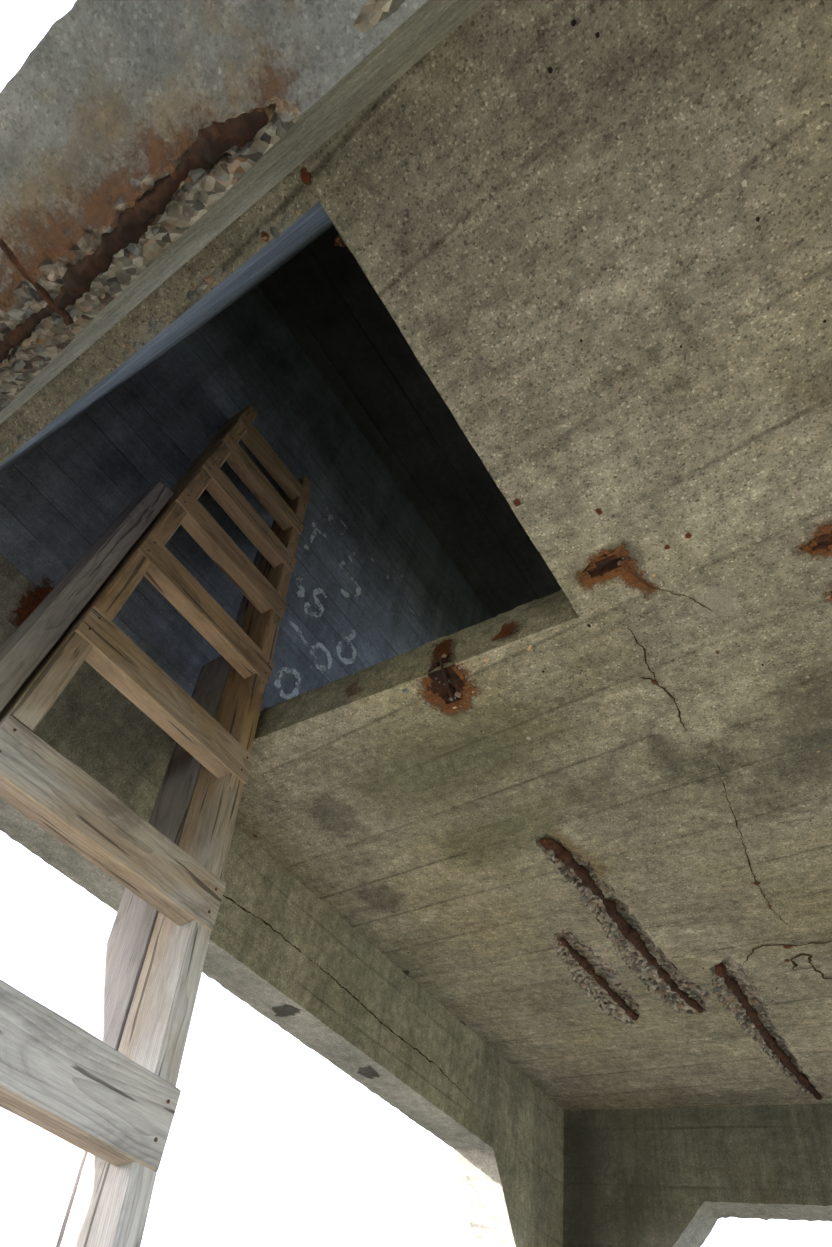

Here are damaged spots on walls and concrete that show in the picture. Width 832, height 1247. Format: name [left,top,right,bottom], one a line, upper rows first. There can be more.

spalling [352,0,406,33]
spalling [0,53,306,412]
corrosion [431,638,454,662]
crack [627,627,692,740]
spalling [525,827,831,1102]
crack [717,764,832,979]